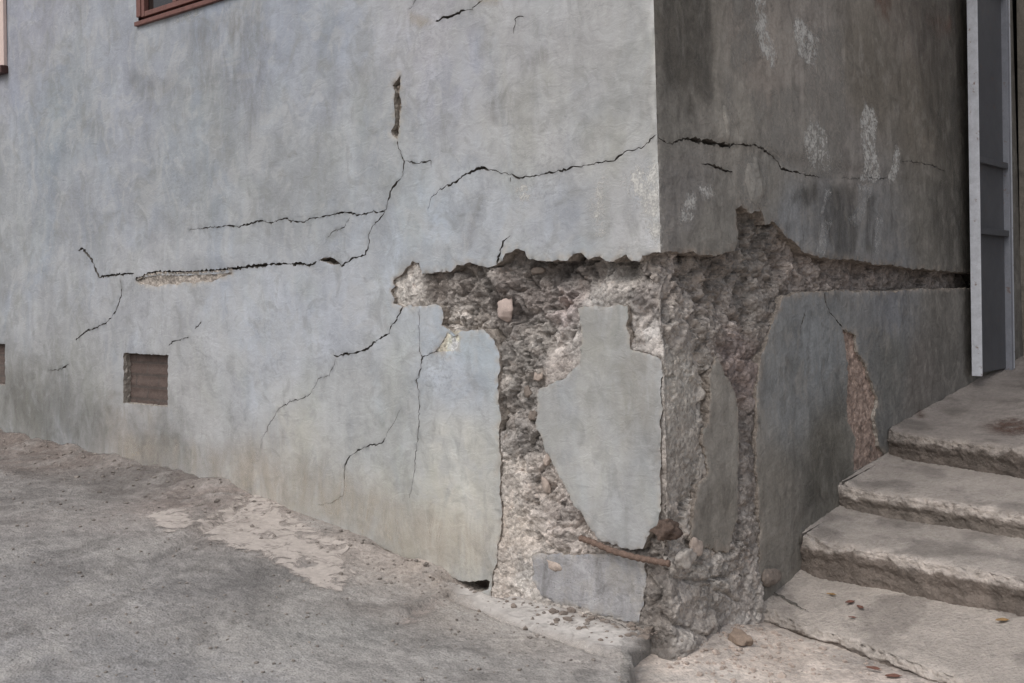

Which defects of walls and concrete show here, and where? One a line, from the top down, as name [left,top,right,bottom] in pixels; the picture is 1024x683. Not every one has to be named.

crack [436,0,482,22]
water stain [755,0,775,68]
water stain [794,19,819,64]
crack [428,135,944,208]
water stain [682,186,713,221]
water stain [804,121,831,170]
water stain [860,105,900,202]
crack [76,141,431,340]
crack [261,307,434,505]
flaking render [391,206,971,661]